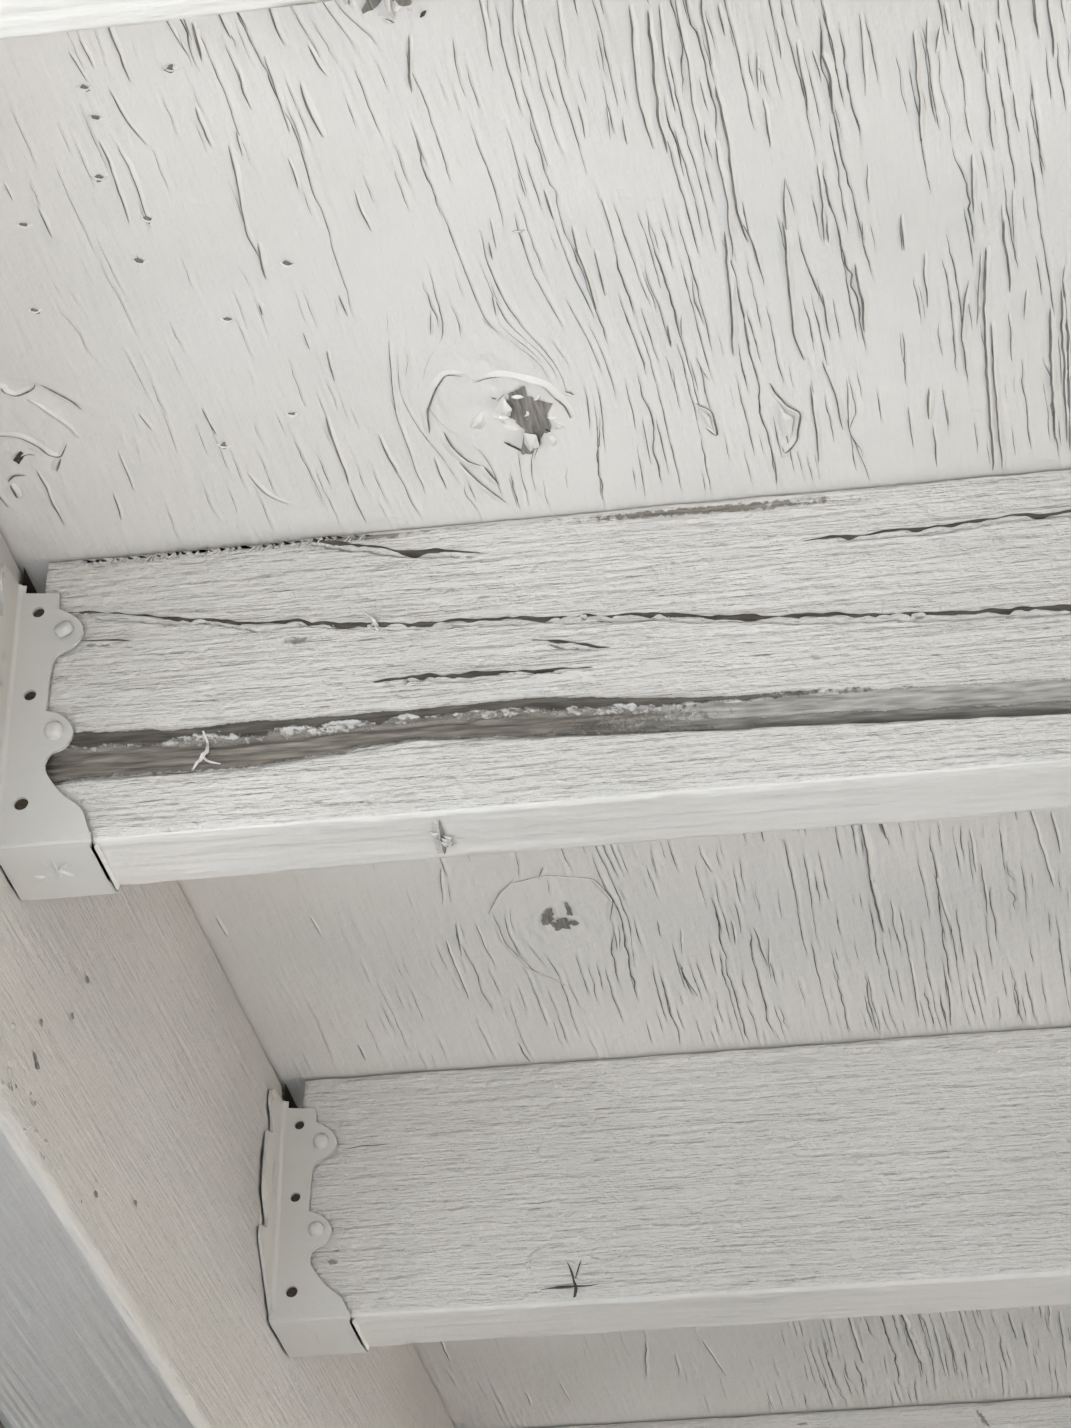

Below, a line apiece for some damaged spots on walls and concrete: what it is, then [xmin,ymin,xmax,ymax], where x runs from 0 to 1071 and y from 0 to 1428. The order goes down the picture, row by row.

crack [0,0,1071,536]
hole [541,902,579,931]
crack [290,811,1071,1072]